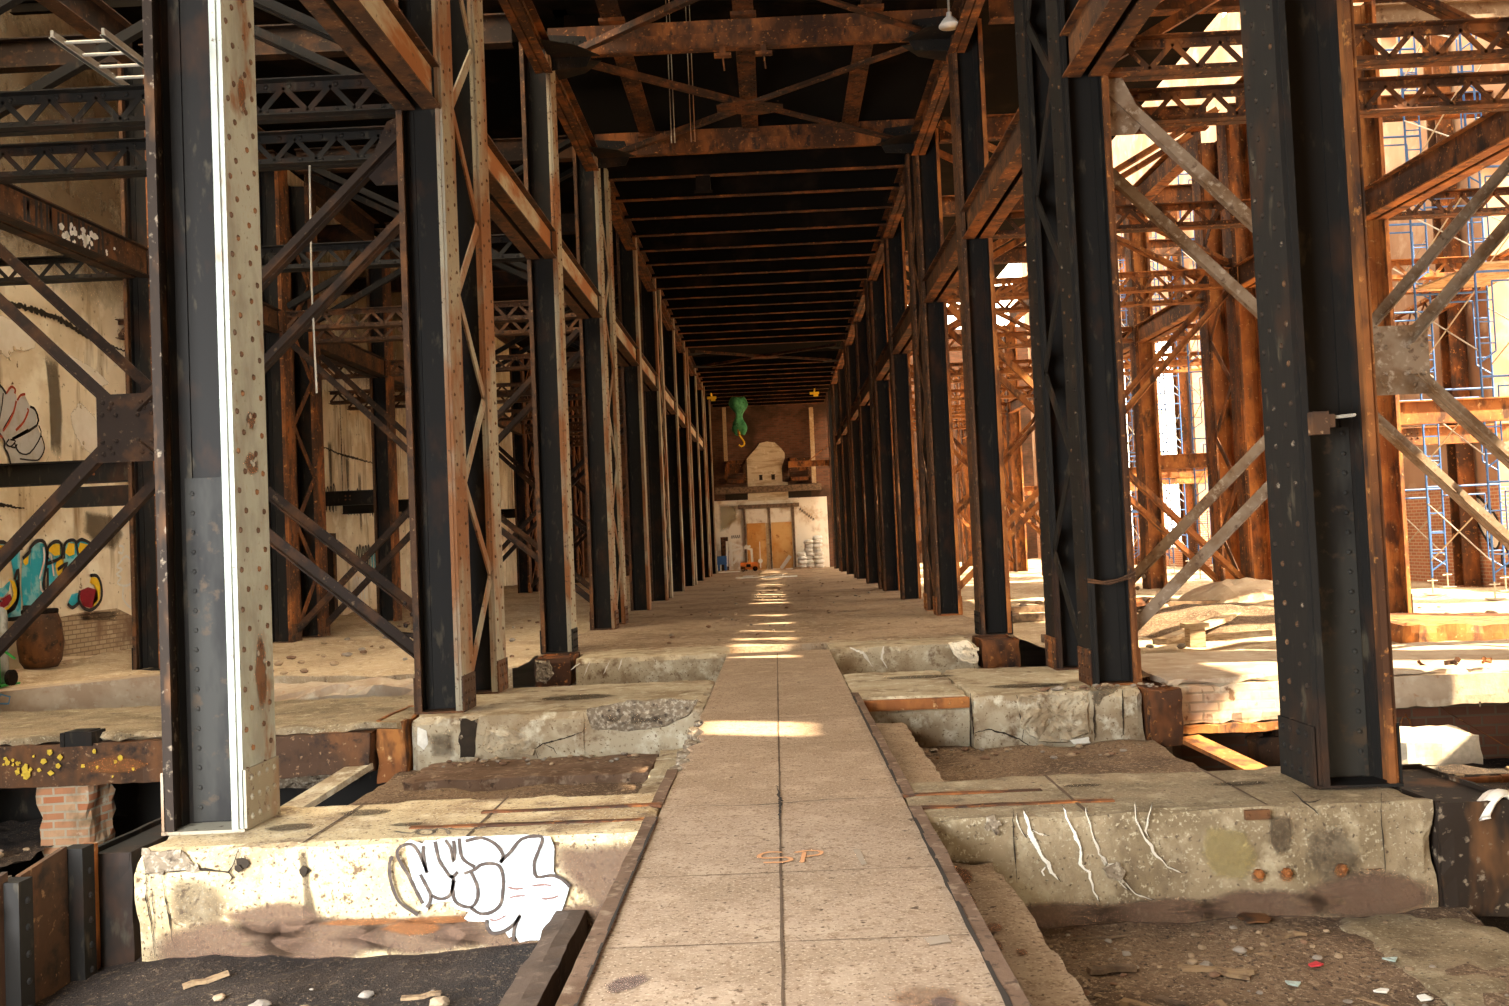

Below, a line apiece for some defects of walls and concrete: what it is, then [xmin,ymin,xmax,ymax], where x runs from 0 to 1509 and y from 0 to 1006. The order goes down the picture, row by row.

rust [238,76,247,113]
rust [246,412,256,431]
rust [245,454,258,473]
spalling [586,698,698,731]
damp [1016,811,1058,879]
damp [1026,804,1431,928]